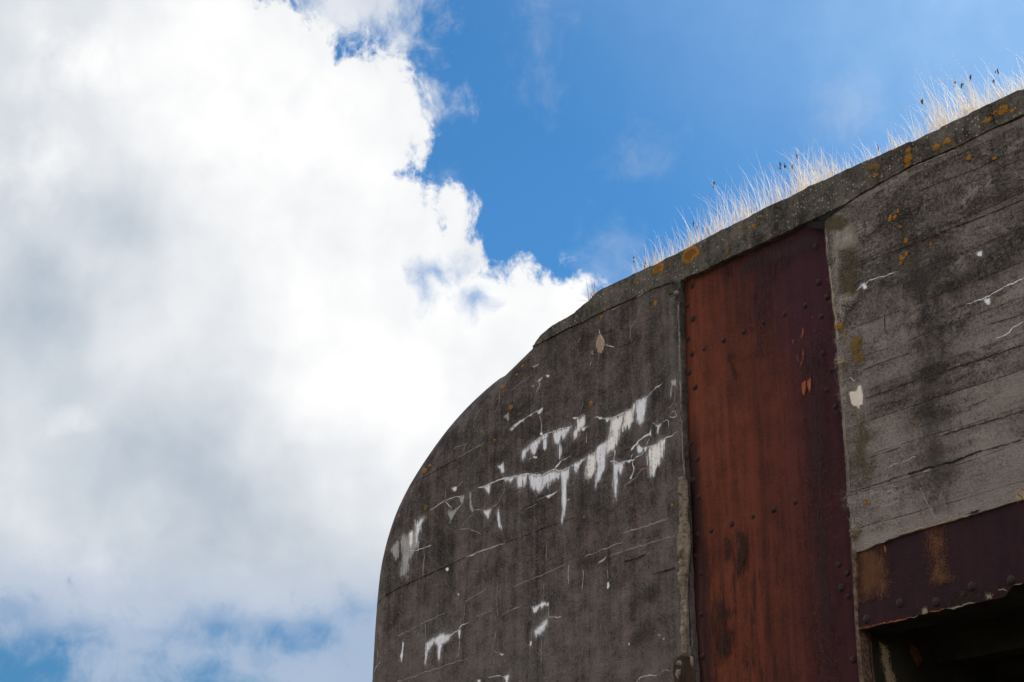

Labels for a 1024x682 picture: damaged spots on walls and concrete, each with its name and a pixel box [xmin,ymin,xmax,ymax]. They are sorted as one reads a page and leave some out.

leakage [391,379,678,582]
rust [858,545,890,604]
rust [857,583,1022,630]